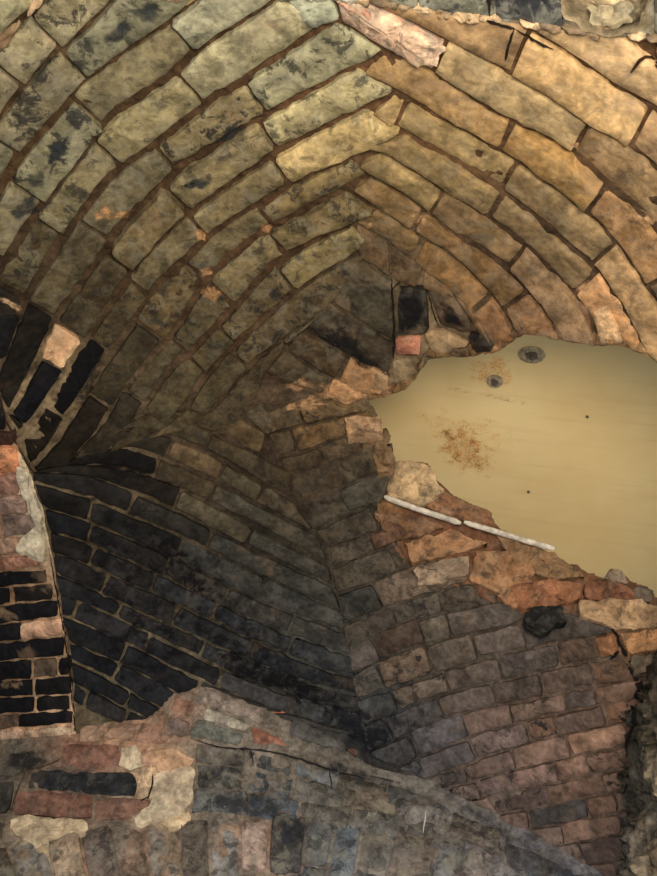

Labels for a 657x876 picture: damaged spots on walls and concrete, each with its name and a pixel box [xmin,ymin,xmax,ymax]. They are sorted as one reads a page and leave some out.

spalling [287,326,525,411]
spalling [595,334,651,358]
spalling [344,415,657,679]